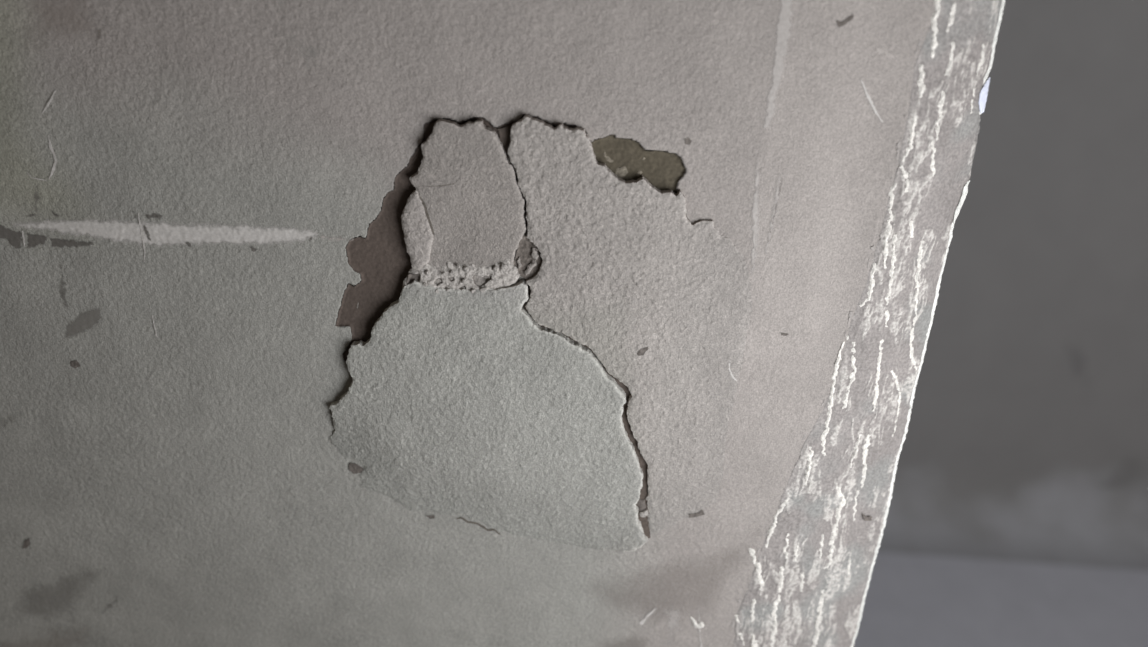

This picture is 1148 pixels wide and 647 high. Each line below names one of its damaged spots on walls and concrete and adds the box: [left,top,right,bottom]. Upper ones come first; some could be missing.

crack [497,127,528,232]
flaking render [329,114,752,552]
crack [523,279,650,538]
spalling [731,0,1005,647]